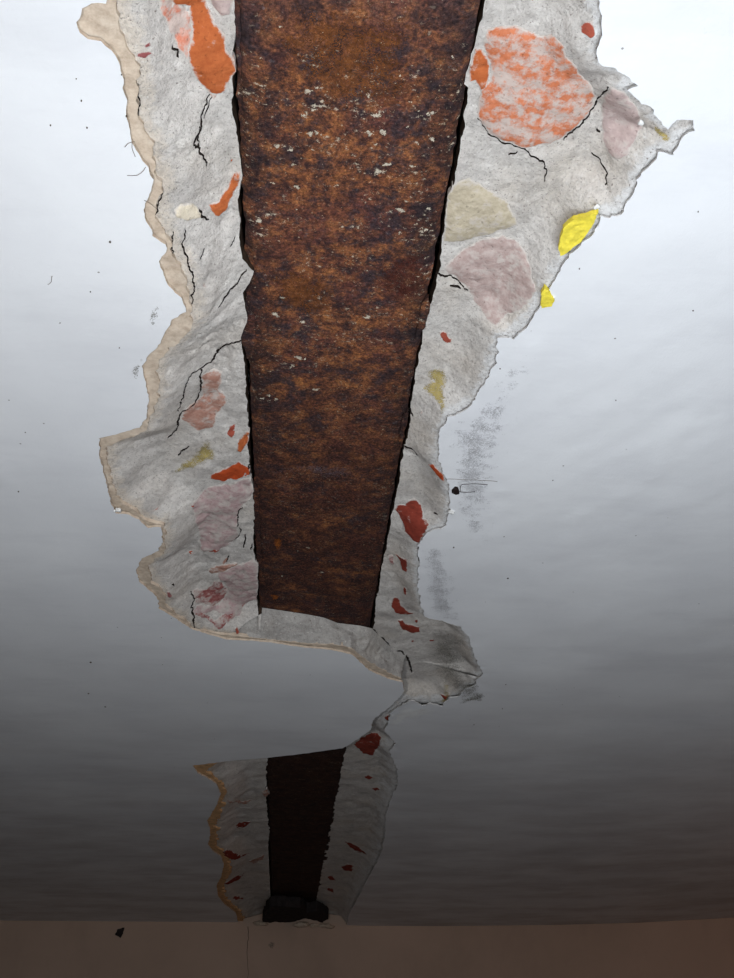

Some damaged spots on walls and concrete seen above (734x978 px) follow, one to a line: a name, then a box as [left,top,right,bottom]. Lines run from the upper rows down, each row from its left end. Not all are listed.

crack [193,94,212,166]
crack [477,118,547,182]
crack [564,86,609,185]
crack [168,339,242,456]
flaking render [78,0,694,929]